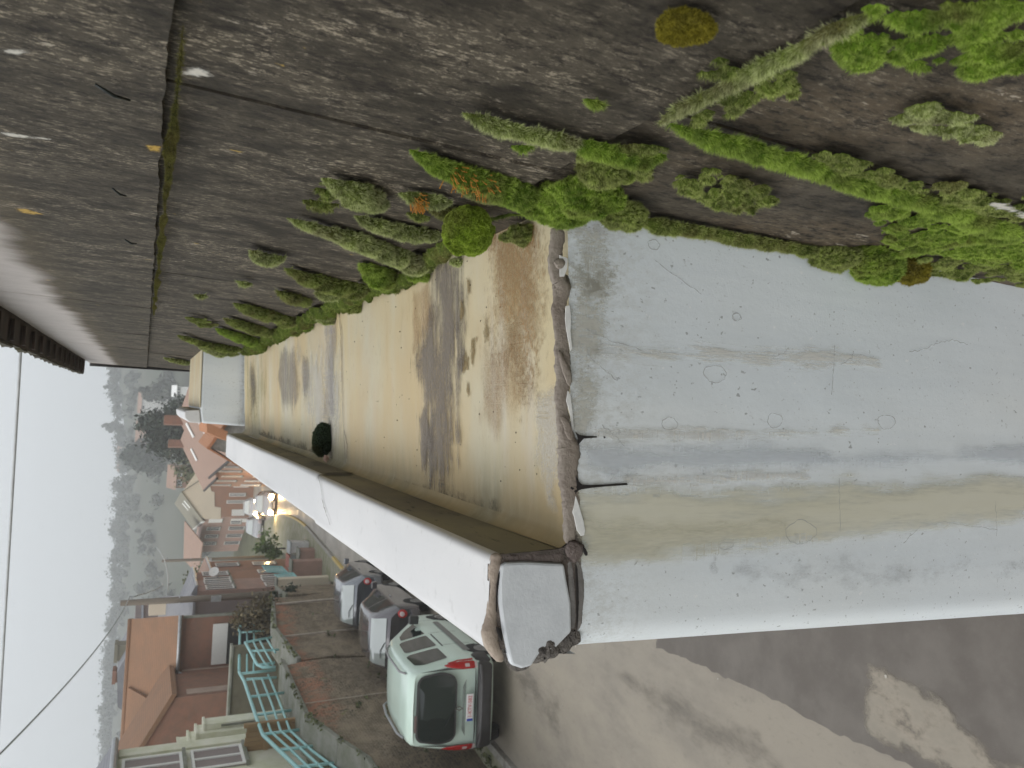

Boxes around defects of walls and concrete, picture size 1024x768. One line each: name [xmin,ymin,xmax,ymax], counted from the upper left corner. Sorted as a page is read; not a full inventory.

water stain [278,325,338,434]
water stain [416,256,465,490]